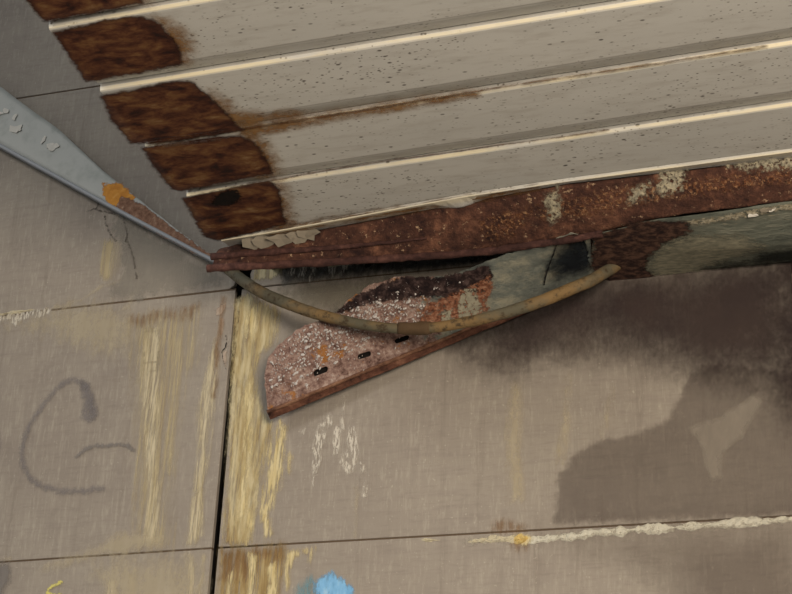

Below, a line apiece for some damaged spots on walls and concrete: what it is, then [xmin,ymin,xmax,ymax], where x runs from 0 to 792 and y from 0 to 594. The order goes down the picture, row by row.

corrosion [26,0,193,82]
corrosion [100,45,792,241]
corrosion [102,182,211,256]
corrosion [335,265,493,322]
damp [546,241,594,281]
damp [458,250,792,381]
corrosion [591,220,693,281]
damp [468,516,792,545]